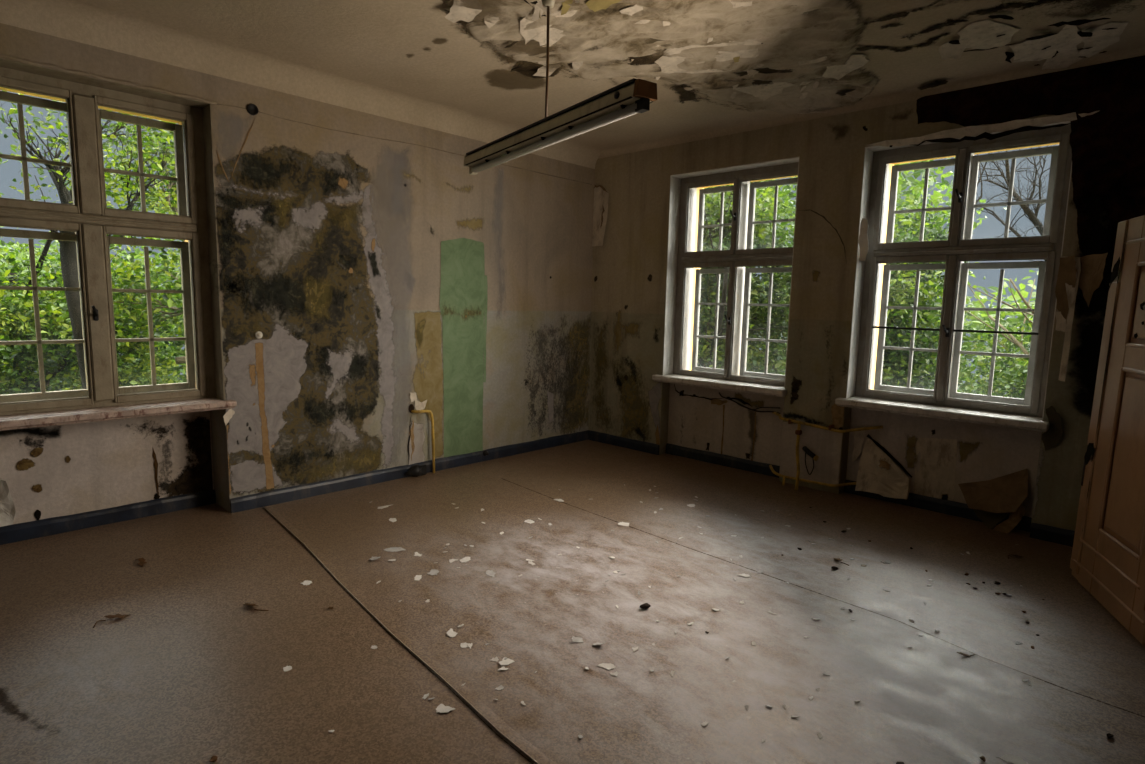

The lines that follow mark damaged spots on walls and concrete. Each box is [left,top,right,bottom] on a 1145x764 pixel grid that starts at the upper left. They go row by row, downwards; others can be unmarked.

peeling [442,0,878,114]
damp [855,0,1135,52]
peeling [863,15,1145,418]
flaking render [223,324,308,494]
damp [525,311,650,440]
spalling [1032,406,1063,519]